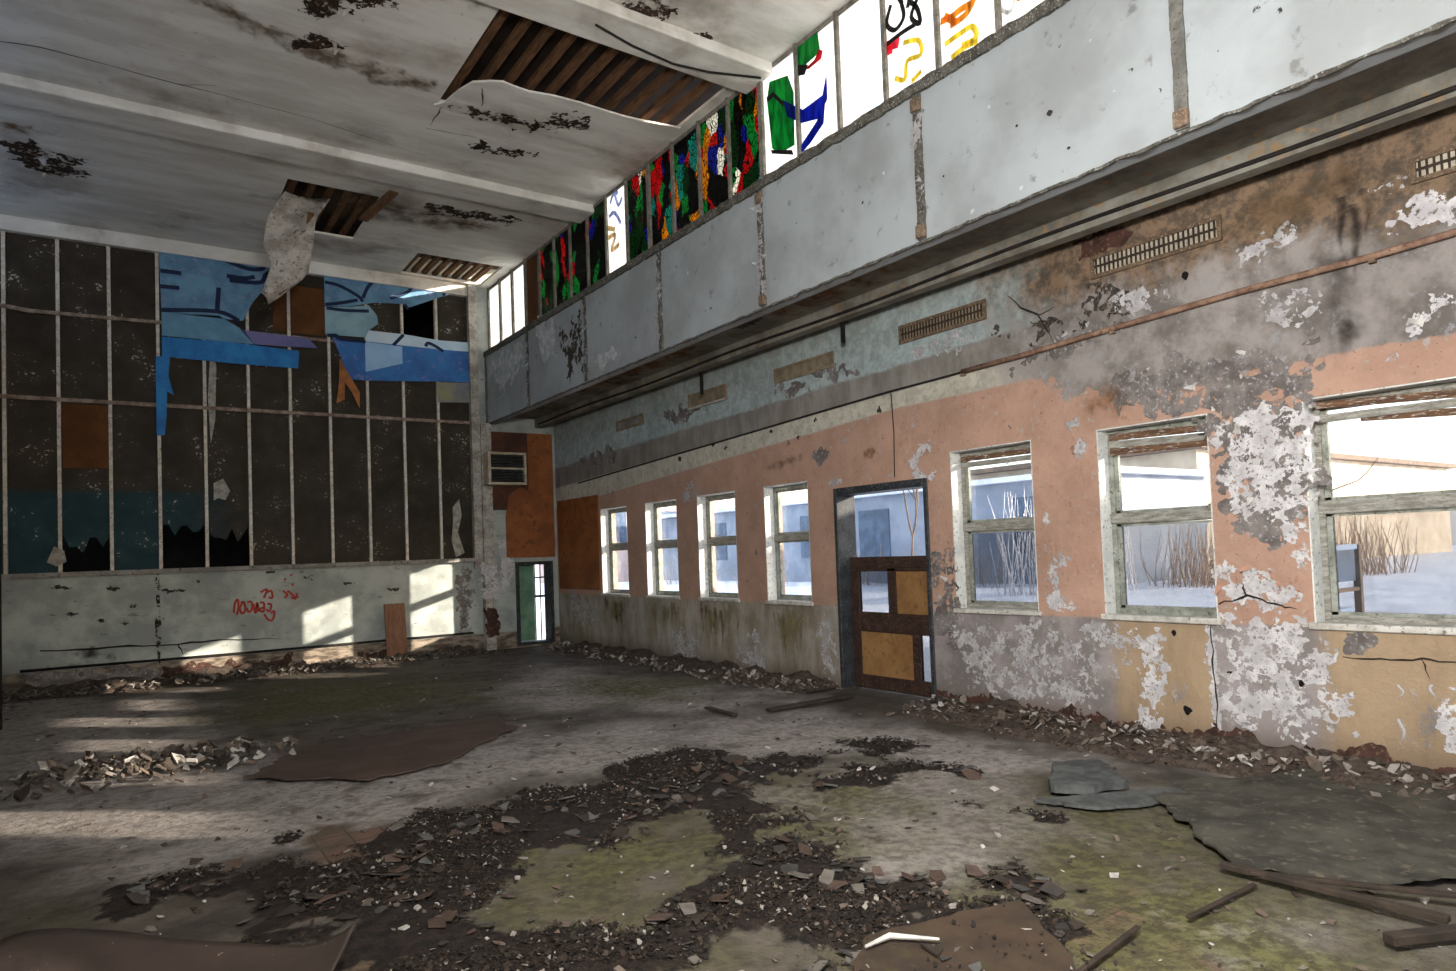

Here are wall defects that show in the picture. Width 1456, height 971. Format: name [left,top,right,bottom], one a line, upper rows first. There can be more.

leakage [202,0,399,66]
mould [622,0,678,21]
leakage [362,65,435,86]
leakage [0,138,95,178]
leakage [1339,176,1370,256]
peeling [1368,175,1456,235]
leakage [1341,321,1353,338]
peeling [930,287,1404,765]
crack [1343,656,1456,679]
peeling [1433,687,1456,775]